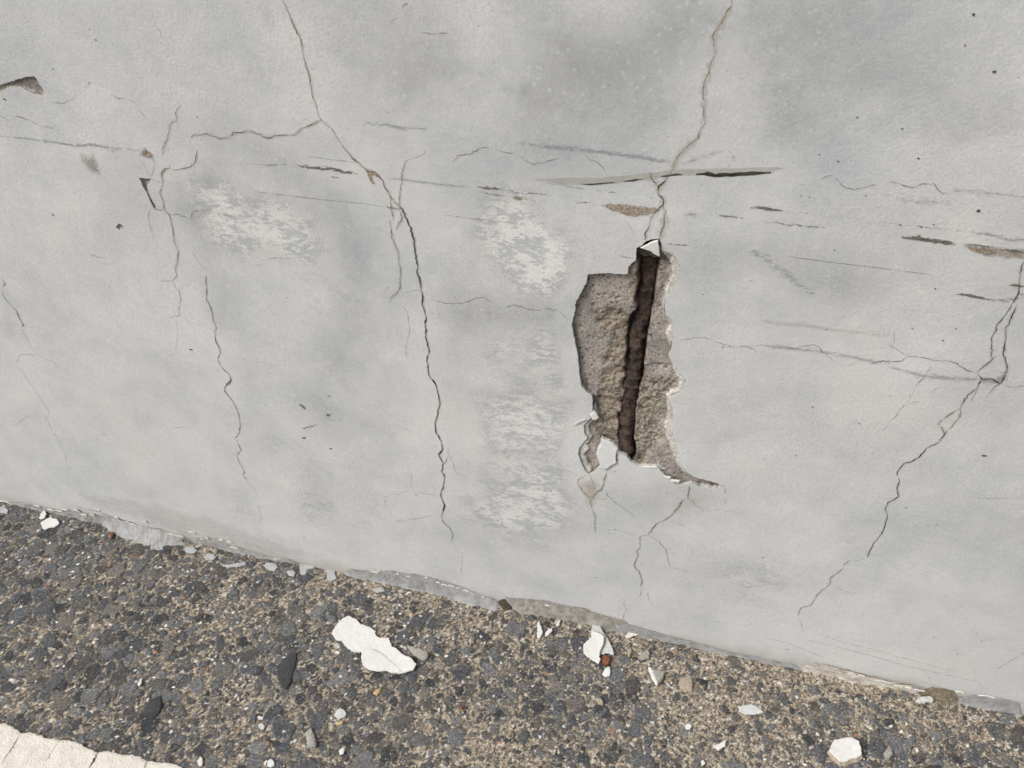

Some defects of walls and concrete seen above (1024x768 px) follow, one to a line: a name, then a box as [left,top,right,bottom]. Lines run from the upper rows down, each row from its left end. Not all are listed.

spalling [0,76,44,95]
crack [644,6,732,238]
crack [148,1,550,537]
crack [578,453,629,525]
spalling [571,239,724,489]
crack [623,487,703,618]
crack [805,263,1023,607]